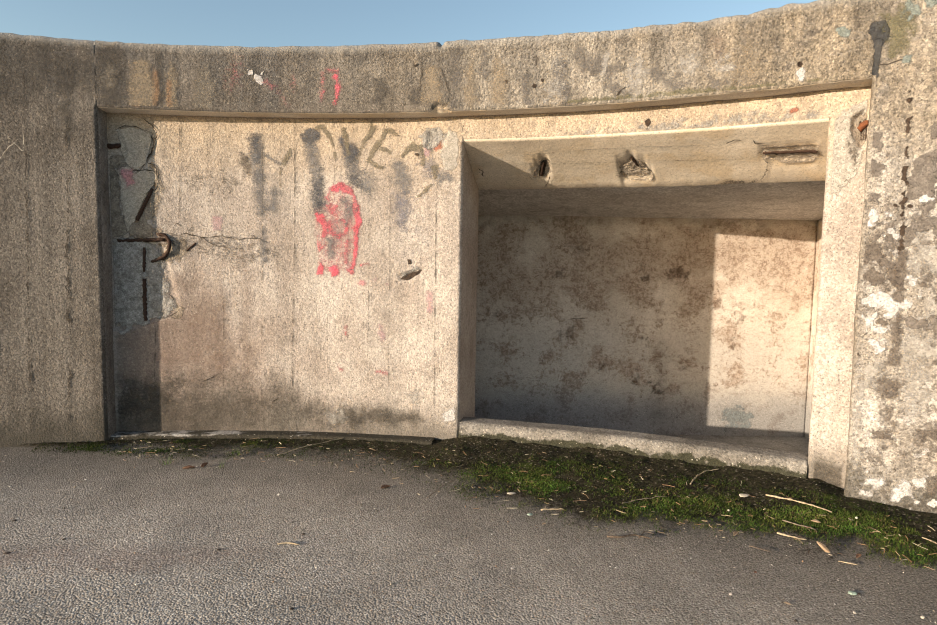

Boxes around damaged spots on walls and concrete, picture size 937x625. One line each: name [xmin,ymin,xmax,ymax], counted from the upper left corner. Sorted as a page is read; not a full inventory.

spalling [534,159,551,185]
spalling [617,156,653,182]
spalling [761,144,819,163]
crack [893,91,914,255]
spalling [107,127,283,335]
crack [173,223,272,247]
spalling [400,259,422,280]
damp [892,249,908,302]
damp [886,314,903,366]
damp [119,379,417,429]
damp [443,407,455,422]
damp [879,406,896,449]